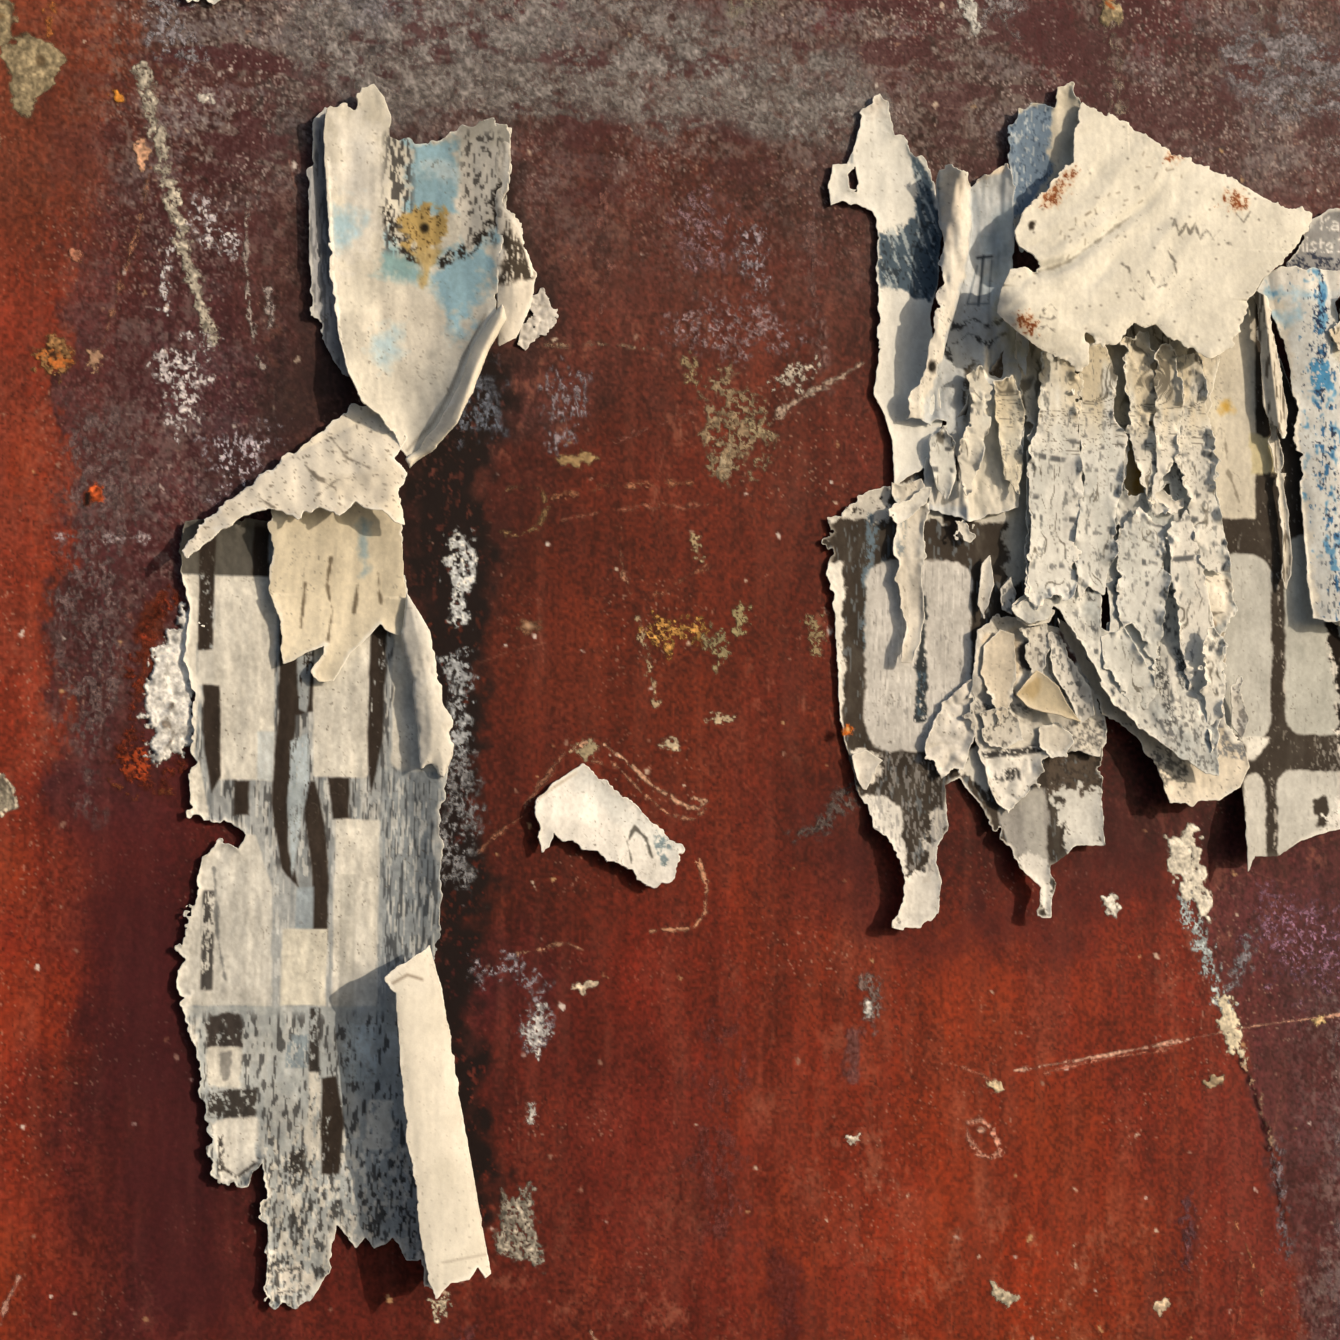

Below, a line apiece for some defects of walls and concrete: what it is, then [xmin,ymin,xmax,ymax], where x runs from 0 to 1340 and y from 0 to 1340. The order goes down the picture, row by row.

rust [1100,0,1123,61]
peeling [0,0,67,117]
rust [31,333,103,376]
rust [84,485,104,505]
rust [108,585,187,801]
spalling [162,702,175,744]
peeling [0,773,18,817]
peeling [1101,894,1122,918]
peeling [496,1182,545,1266]